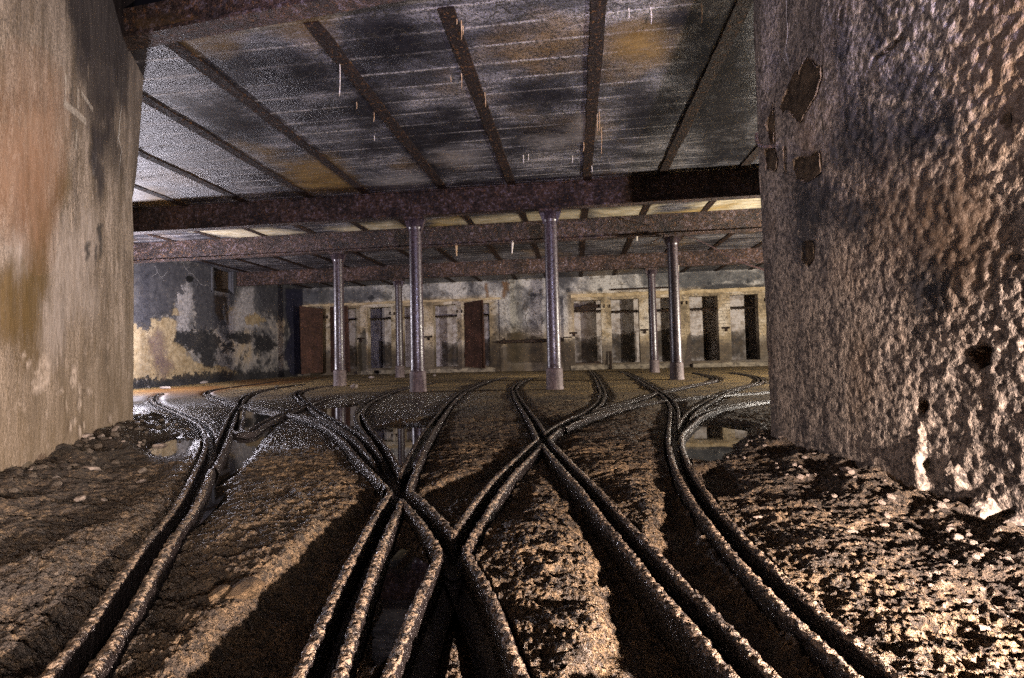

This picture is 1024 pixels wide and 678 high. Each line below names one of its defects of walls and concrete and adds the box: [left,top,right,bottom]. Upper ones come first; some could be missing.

leakage [69,0,135,196]
spalling [764,57,822,183]
corrosion [142,186,170,204]
corrosion [435,218,458,226]
flaking render [133,302,238,383]